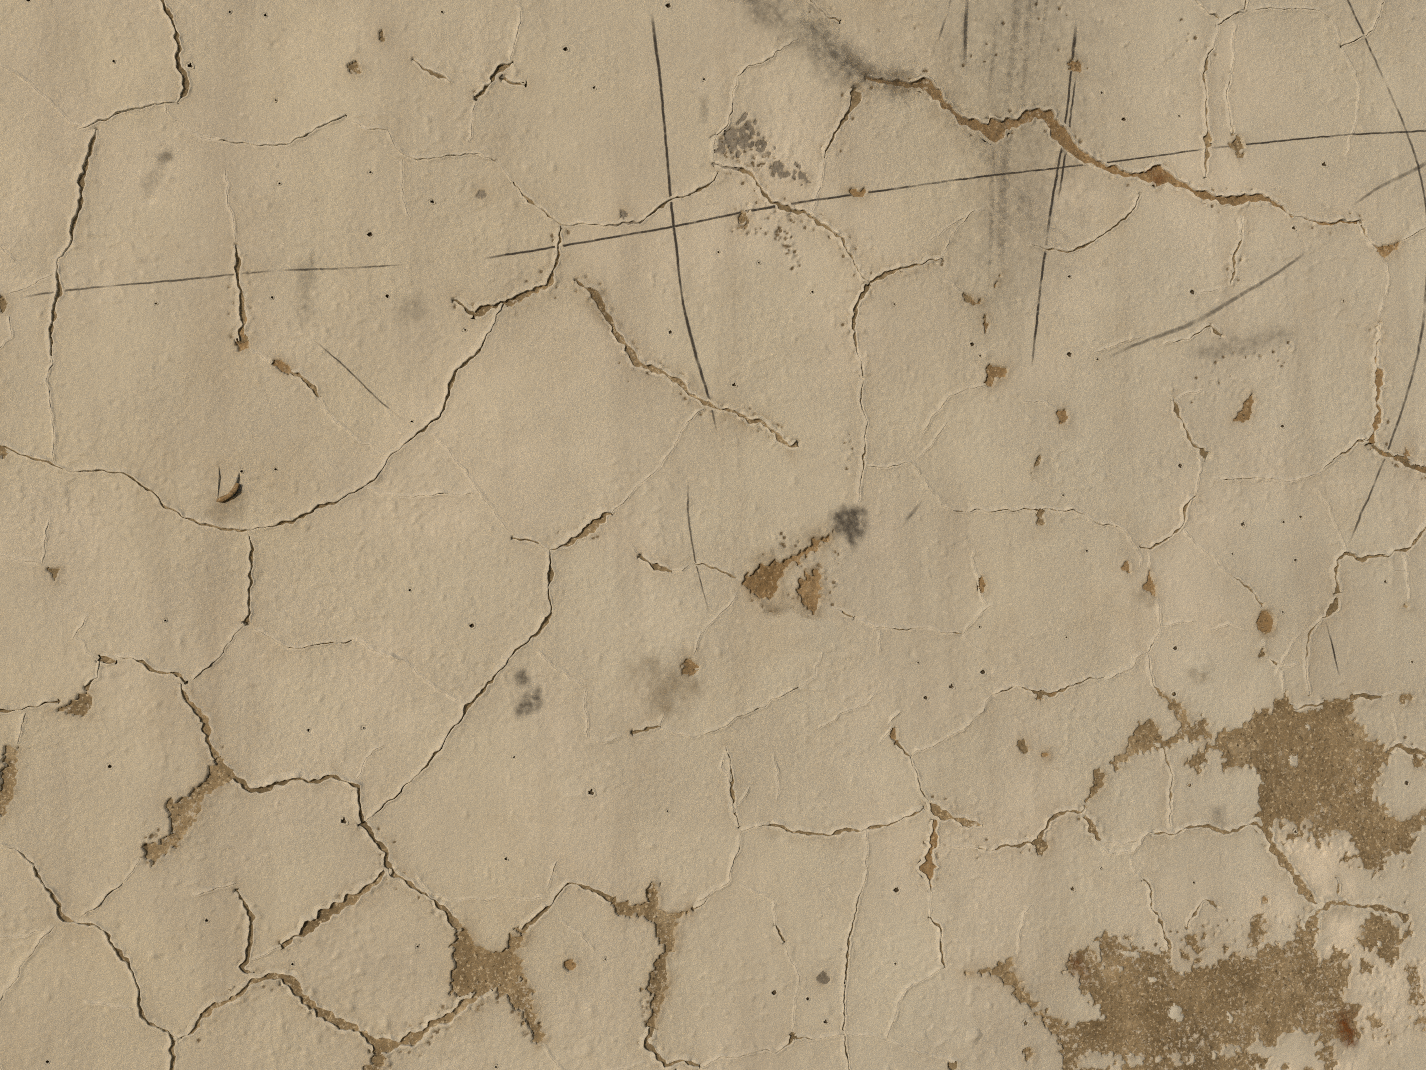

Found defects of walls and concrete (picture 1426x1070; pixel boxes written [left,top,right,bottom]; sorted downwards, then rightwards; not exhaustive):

crack [709,0,1426,508]
crack [0,0,799,1070]
spalling [742,530,833,615]
crack [638,296,1426,1070]
spalling [142,745,250,866]
peeling [1076,688,1426,879]
spalling [449,923,546,1043]
spalling [611,882,694,1028]
peeling [964,896,1426,1070]